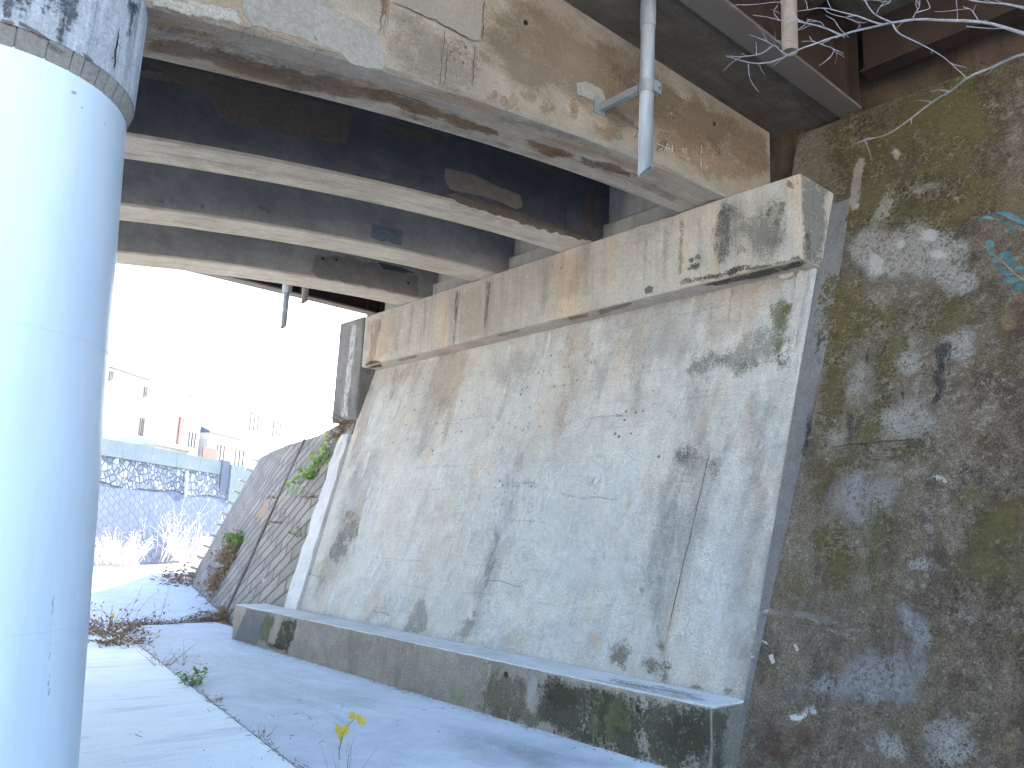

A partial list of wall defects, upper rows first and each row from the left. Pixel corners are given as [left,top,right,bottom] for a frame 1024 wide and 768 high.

spalling [152,0,244,27]
rust [148,39,498,136]
crack [379,0,484,92]
peeling [444,156,596,241]
rust [525,140,638,178]
peeling [315,257,417,293]
leakage [331,400,401,561]
crack [664,448,711,647]
leakage [371,593,427,632]
leakage [525,674,540,712]